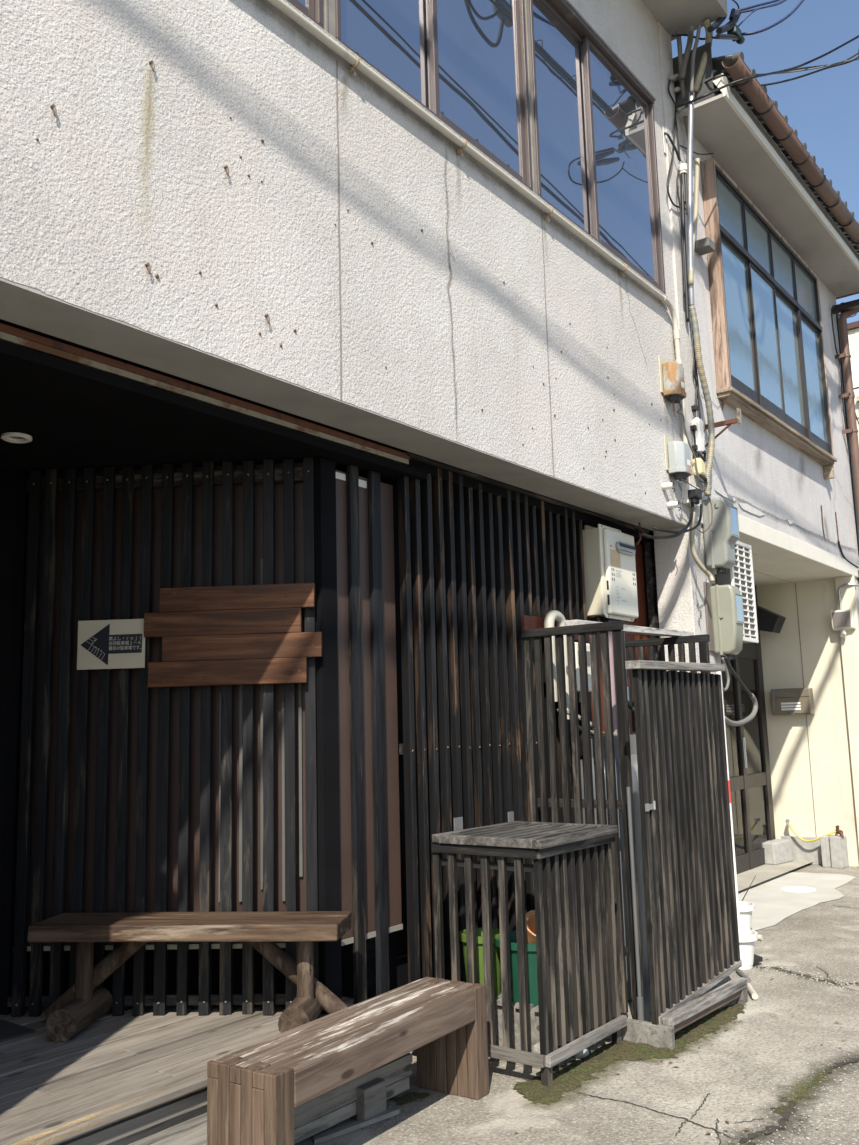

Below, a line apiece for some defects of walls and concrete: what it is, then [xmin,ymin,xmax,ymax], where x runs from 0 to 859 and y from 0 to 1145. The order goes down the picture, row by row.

crack [675,1093,764,1145]